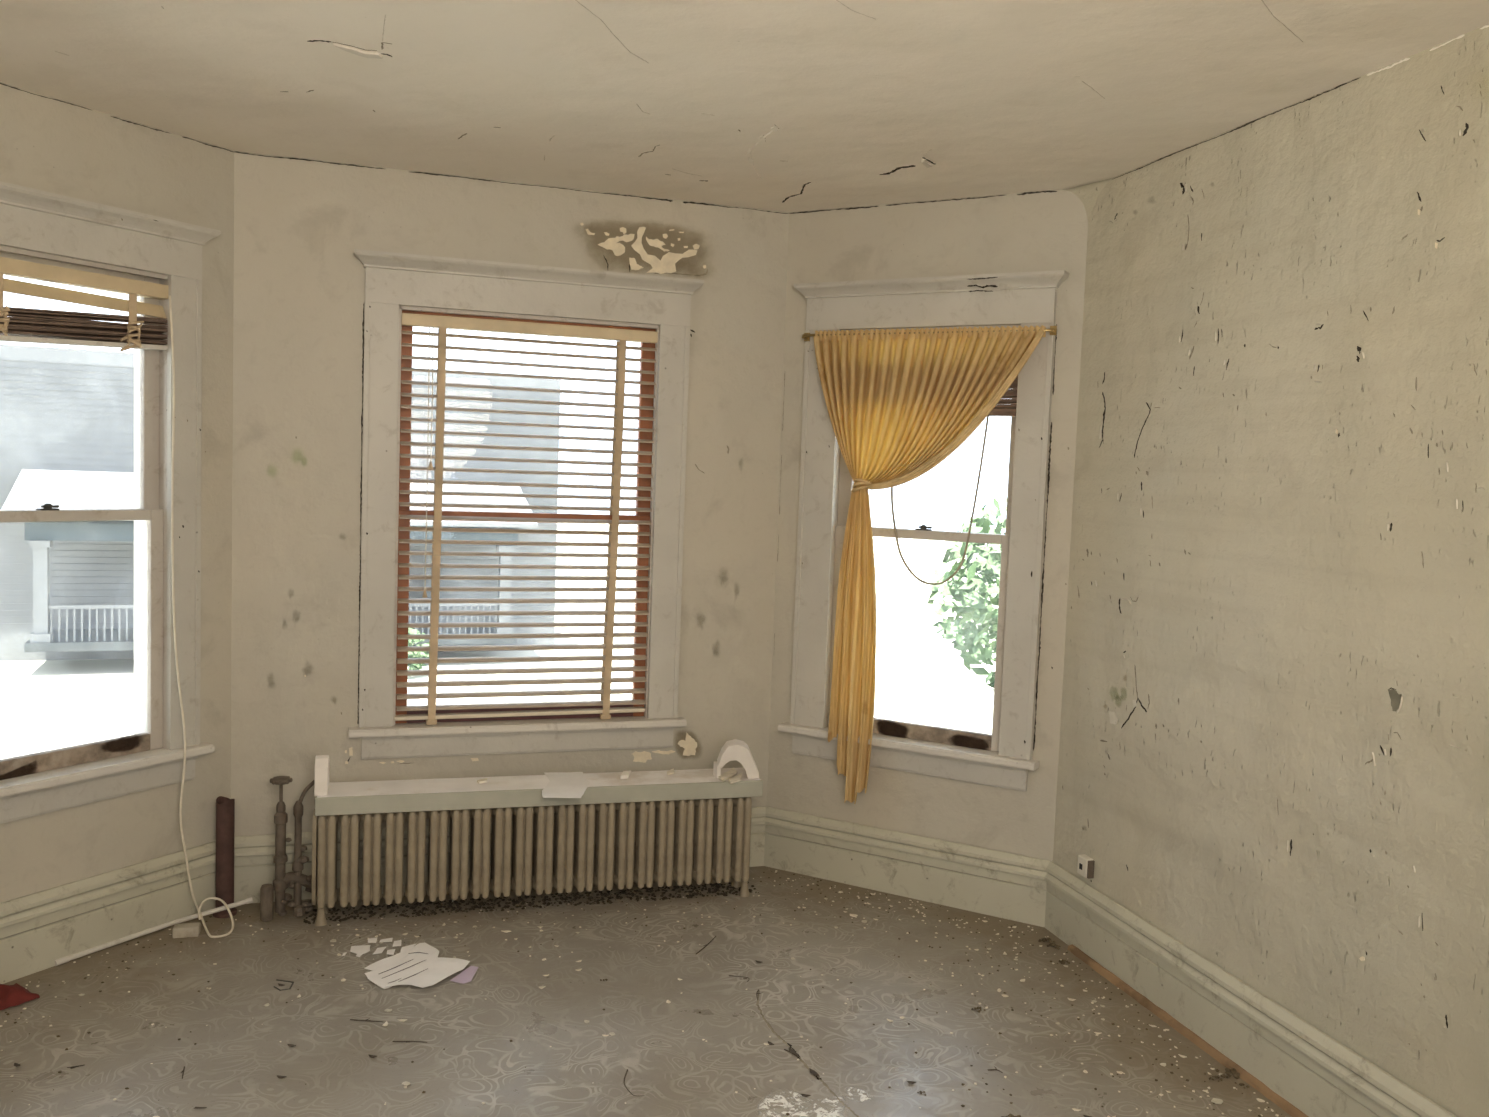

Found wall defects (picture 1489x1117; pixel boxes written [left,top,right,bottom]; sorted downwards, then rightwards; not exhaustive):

crack [307,15,392,59]
crack [0,83,1057,214]
peeling [580,223,708,276]
crack [1109,666,1150,728]
spalling [1388,688,1403,713]